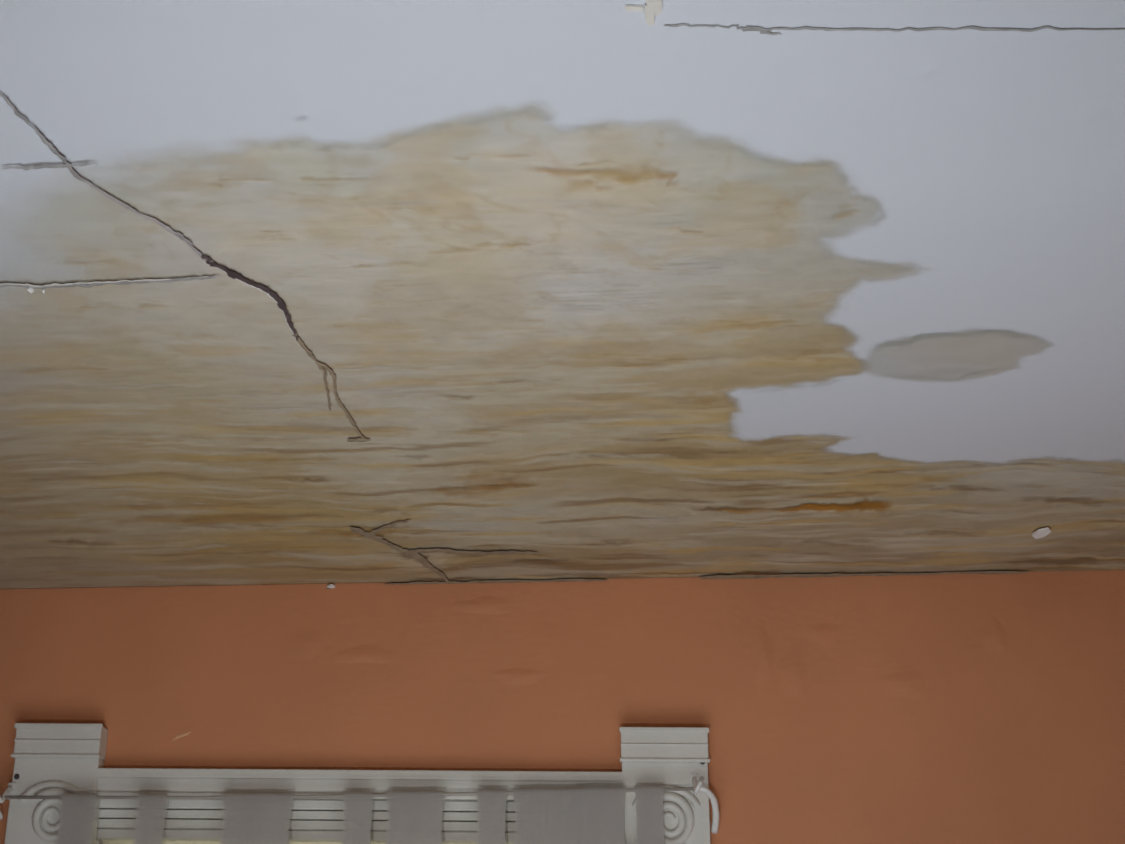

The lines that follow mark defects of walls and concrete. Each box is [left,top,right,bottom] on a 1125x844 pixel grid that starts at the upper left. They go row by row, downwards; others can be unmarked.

crack [664,24,1125,35]
crack [0,94,371,442]
leakage [0,108,1125,589]